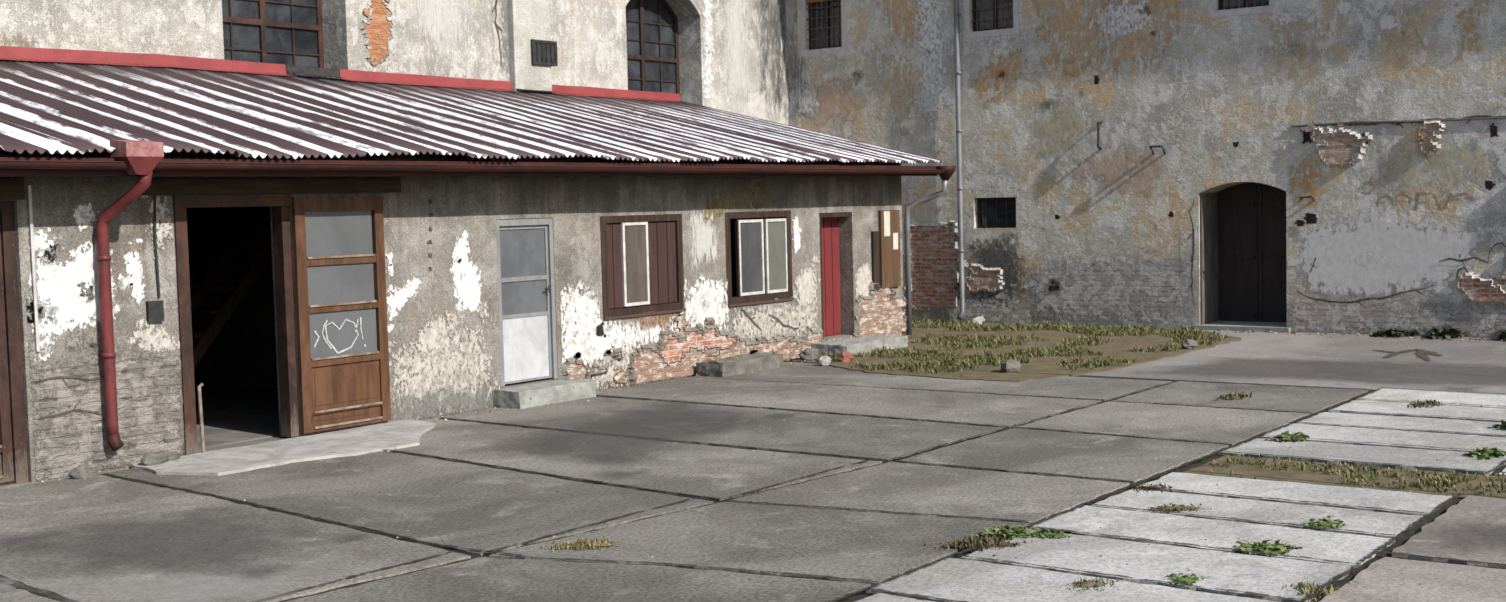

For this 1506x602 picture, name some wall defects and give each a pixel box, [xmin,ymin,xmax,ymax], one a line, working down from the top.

flaking render [359,0,393,67]
flaking render [1301,122,1373,169]
flaking render [1412,120,1446,156]
flaking render [1485,102,1506,190]
flaking render [26,195,190,481]
flaking render [372,200,500,425]
flaking render [560,216,1195,390]
flaking render [1287,213,1506,338]